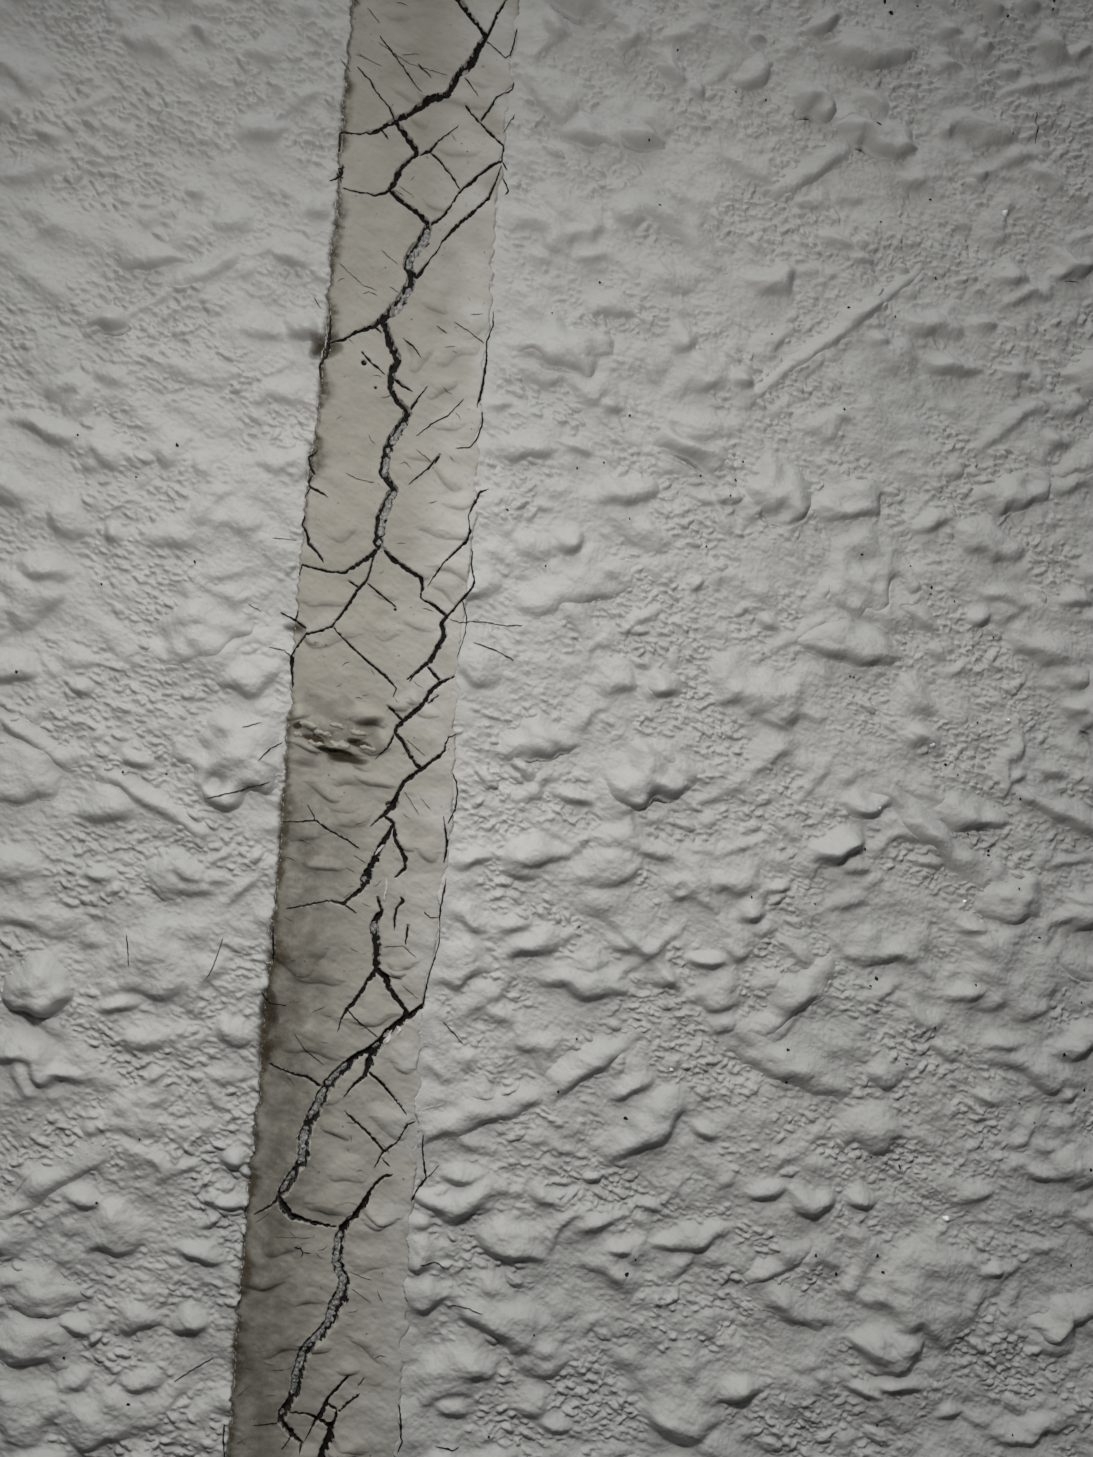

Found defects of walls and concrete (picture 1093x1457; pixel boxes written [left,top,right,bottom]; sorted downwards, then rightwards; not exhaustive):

crack [207,722,282,799]
crack [222,0,523,1457]